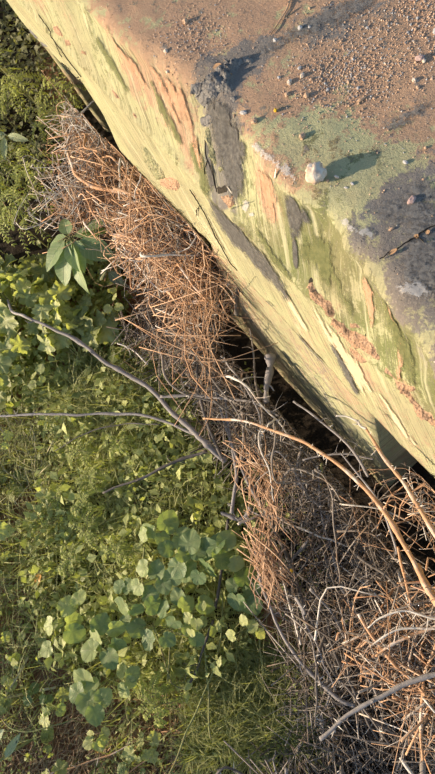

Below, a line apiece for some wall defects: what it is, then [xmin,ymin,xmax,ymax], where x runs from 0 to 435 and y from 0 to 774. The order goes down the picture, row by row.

crack [204,140,217,192]
damp [204,97,295,202]
crack [190,190,237,271]
damp [341,218,373,239]
damp [374,175,435,305]
corrosion [362,277,375,327]